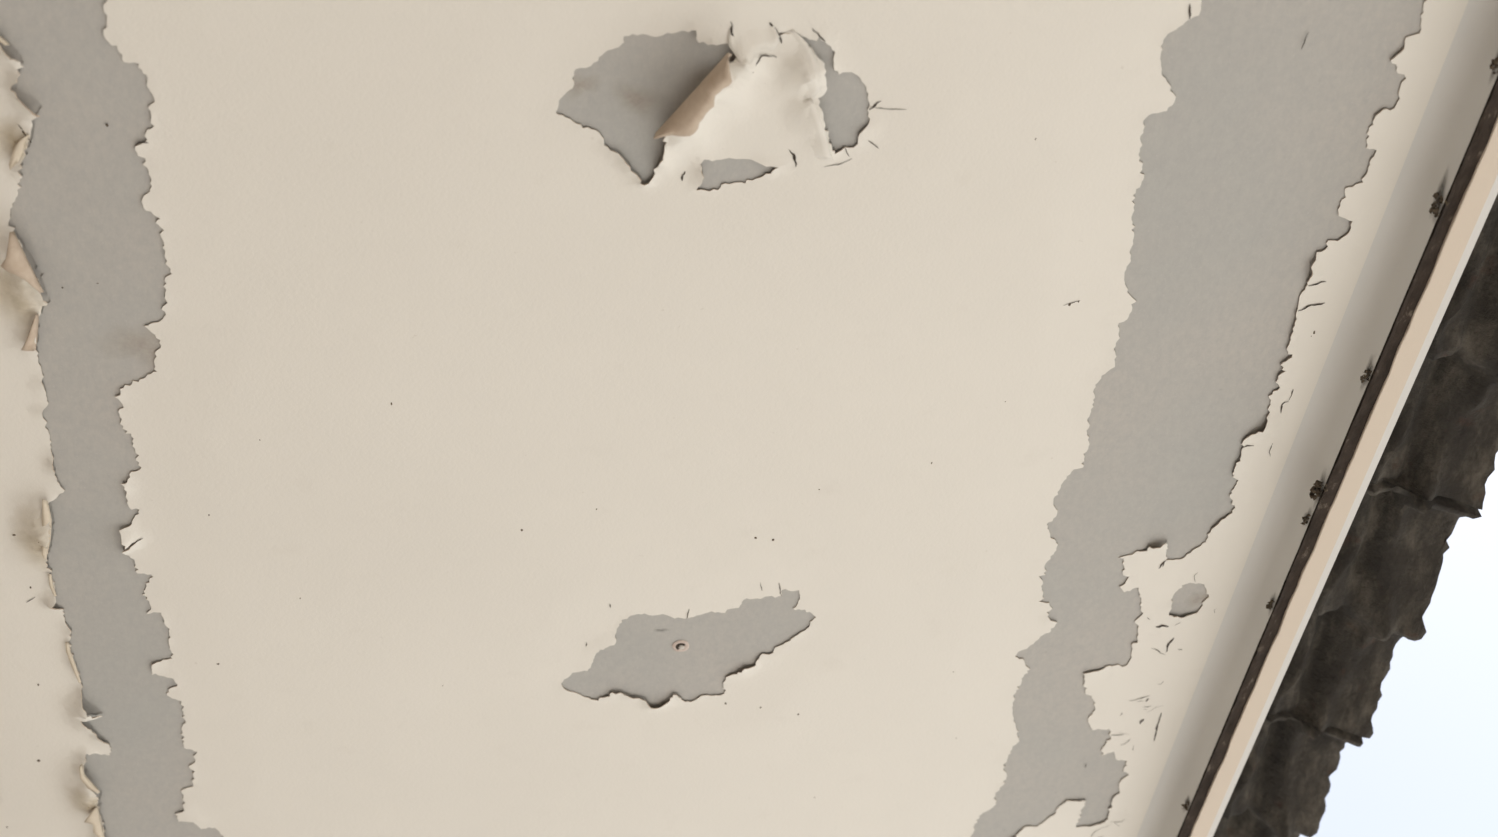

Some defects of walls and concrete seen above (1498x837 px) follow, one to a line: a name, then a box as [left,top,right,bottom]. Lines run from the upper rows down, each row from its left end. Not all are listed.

peeling [0,0,224,837]
peeling [562,589,815,711]
peeling [556,22,870,190]
peeling [971,0,1424,837]